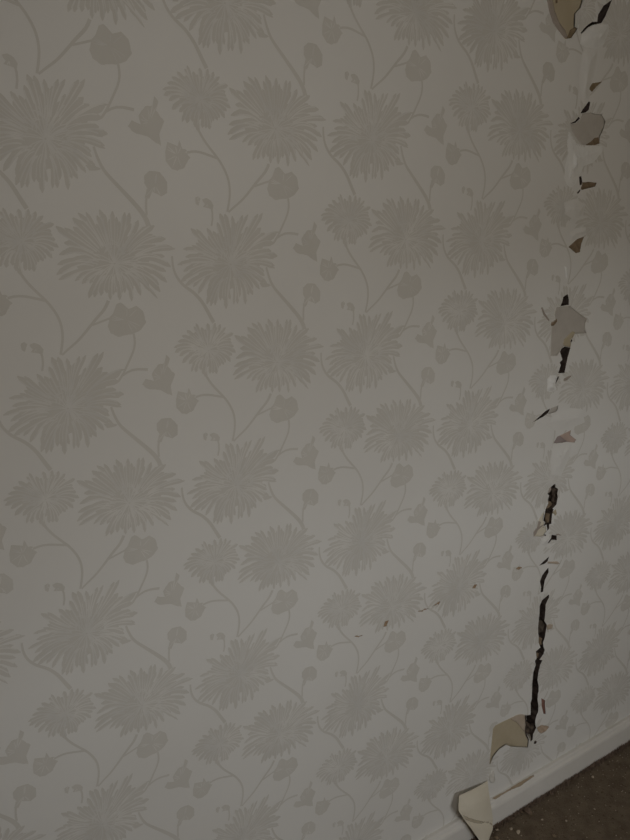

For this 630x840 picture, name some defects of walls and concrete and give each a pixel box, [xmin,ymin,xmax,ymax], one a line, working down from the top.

crack [575,0,612,34]
crack [571,102,590,124]
crack [561,294,569,306]
crack [555,339,572,384]
crack [525,484,558,741]